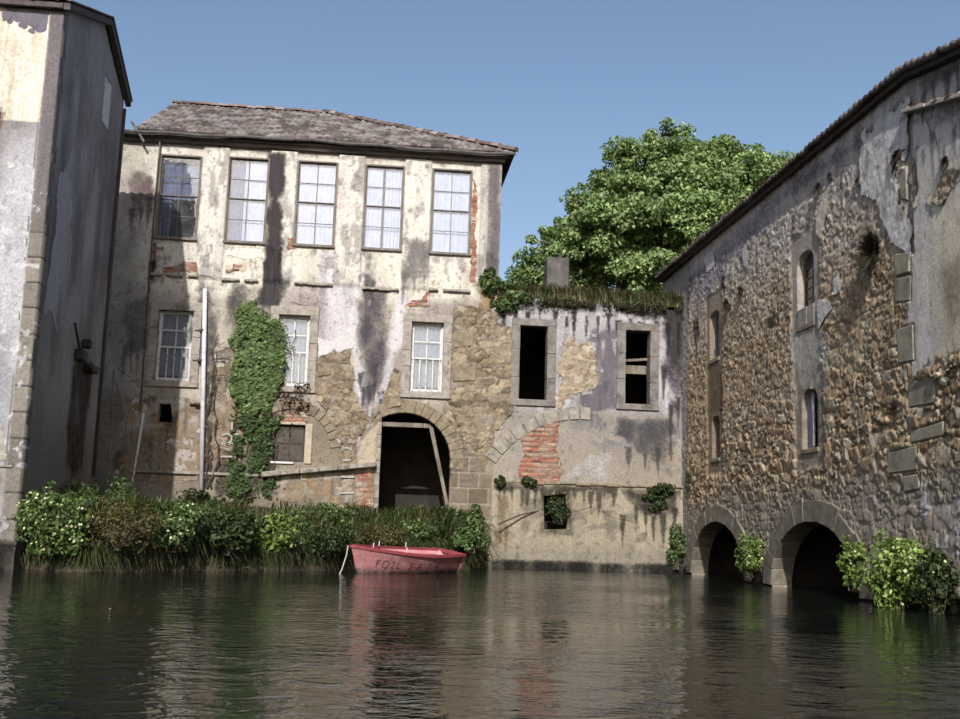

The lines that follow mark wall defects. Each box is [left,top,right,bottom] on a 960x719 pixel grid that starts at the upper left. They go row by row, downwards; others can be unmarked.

peeling [2,6,49,33]
flaking render [162,261,197,278]
flaking render [469,180,483,285]
damp [688,205,774,301]
spalling [315,348,401,451]
damp [358,274,391,424]
spalling [447,305,517,450]
spalling [516,337,603,485]
damp [501,300,699,466]
damp [709,364,722,421]
spalling [910,344,960,387]